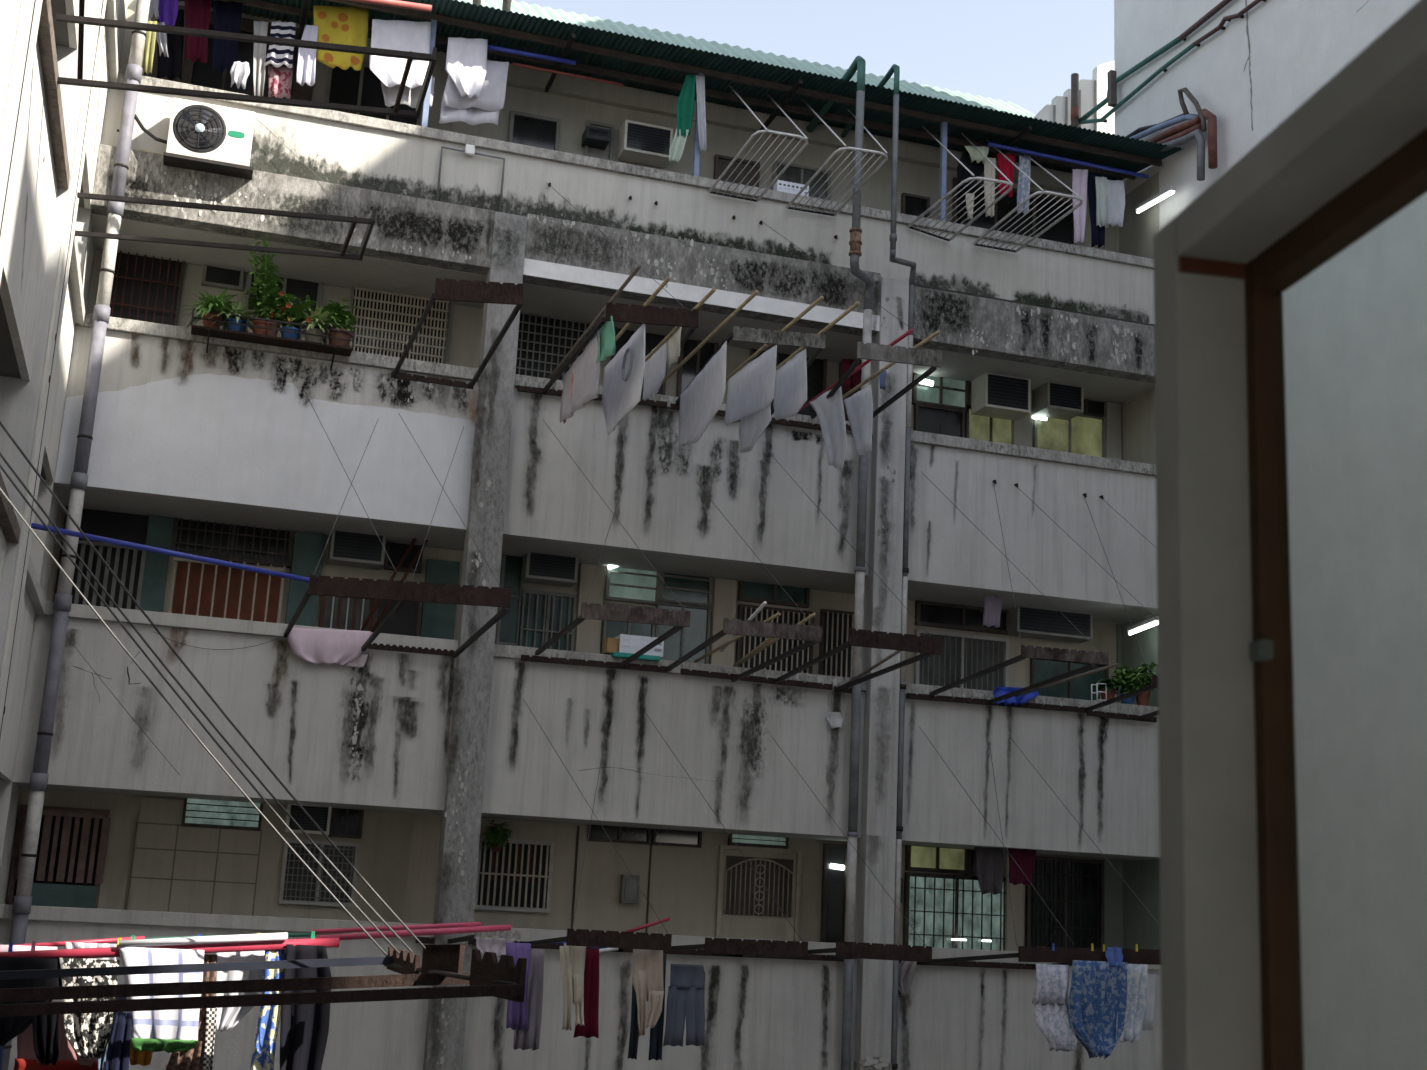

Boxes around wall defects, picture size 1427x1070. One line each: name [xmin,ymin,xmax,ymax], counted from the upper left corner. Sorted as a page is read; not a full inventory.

leakage [249,135,857,305]
leakage [162,338,362,405]
leakage [378,335,498,484]
leakage [525,393,542,511]
leakage [645,406,739,532]
leakage [758,423,773,537]
leakage [915,275,996,332]
leakage [1013,292,1149,368]
leakage [269,640,297,780]
leakage [347,654,380,779]
leakage [637,677,648,756]
leakage [1078,714,1108,832]